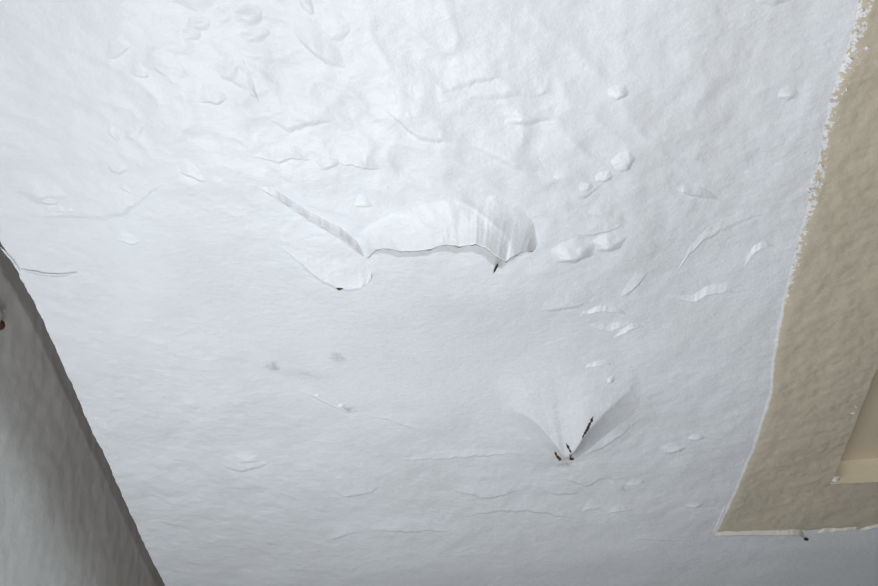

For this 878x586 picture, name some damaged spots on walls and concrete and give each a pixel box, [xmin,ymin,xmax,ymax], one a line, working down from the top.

peeling [260,187,538,272]
peeling [714,529,805,537]
peeling [818,524,878,533]